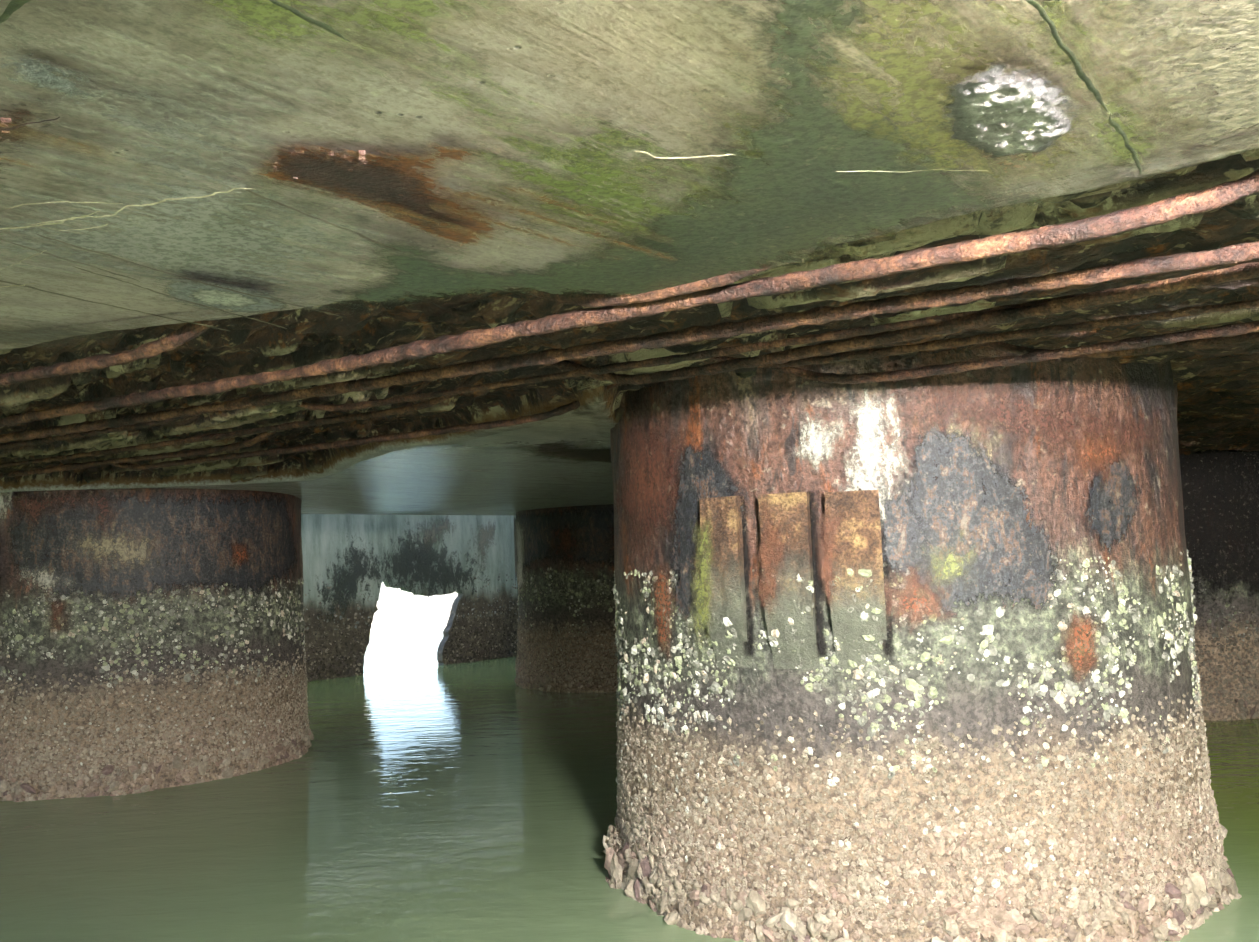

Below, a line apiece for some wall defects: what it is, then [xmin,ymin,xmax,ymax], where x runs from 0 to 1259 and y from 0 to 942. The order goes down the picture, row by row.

crack [0,188,256,288]
rust [257,145,677,260]
spalling [0,130,1259,622]
efflorescence [835,391,916,520]
water stain [317,516,495,627]
rust [653,565,675,657]
rust [818,515,843,602]
rust [884,566,951,632]
rust [1061,611,1098,681]